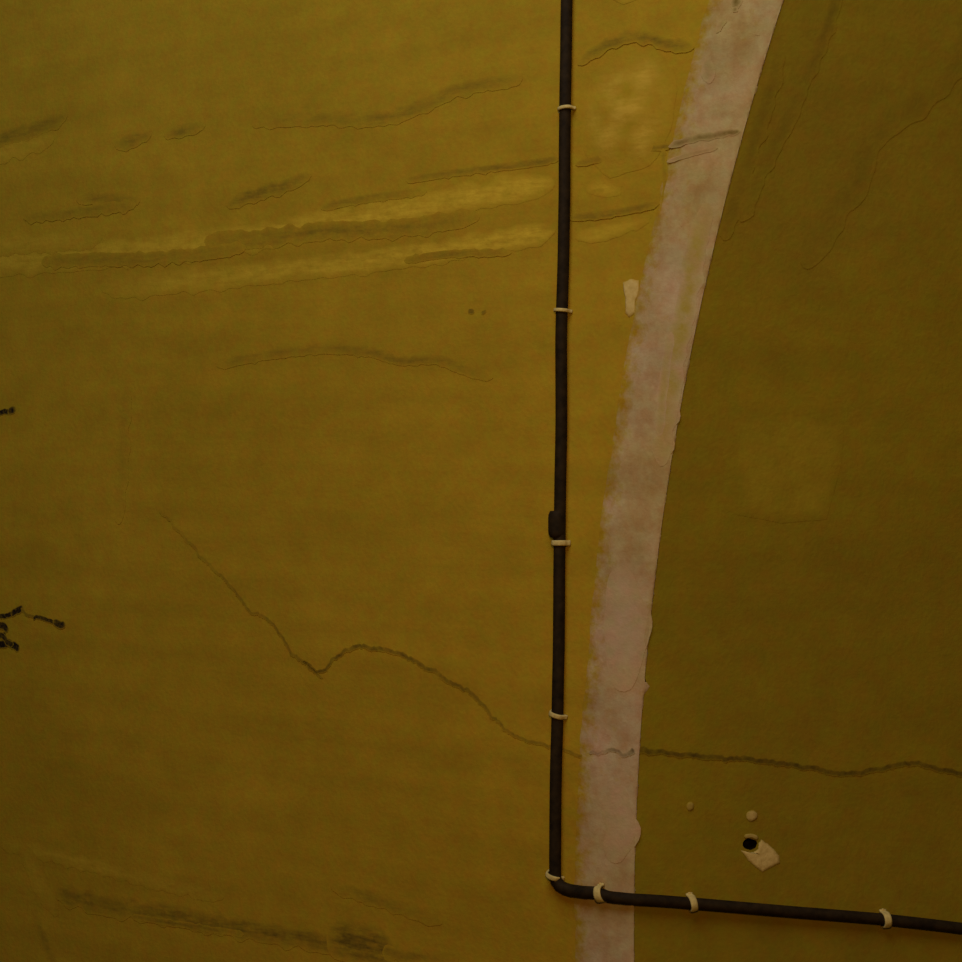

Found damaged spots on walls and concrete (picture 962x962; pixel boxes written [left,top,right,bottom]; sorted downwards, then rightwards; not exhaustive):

crack [0,605,65,652]
crack [159,510,962,777]
spalling [741,833,780,872]